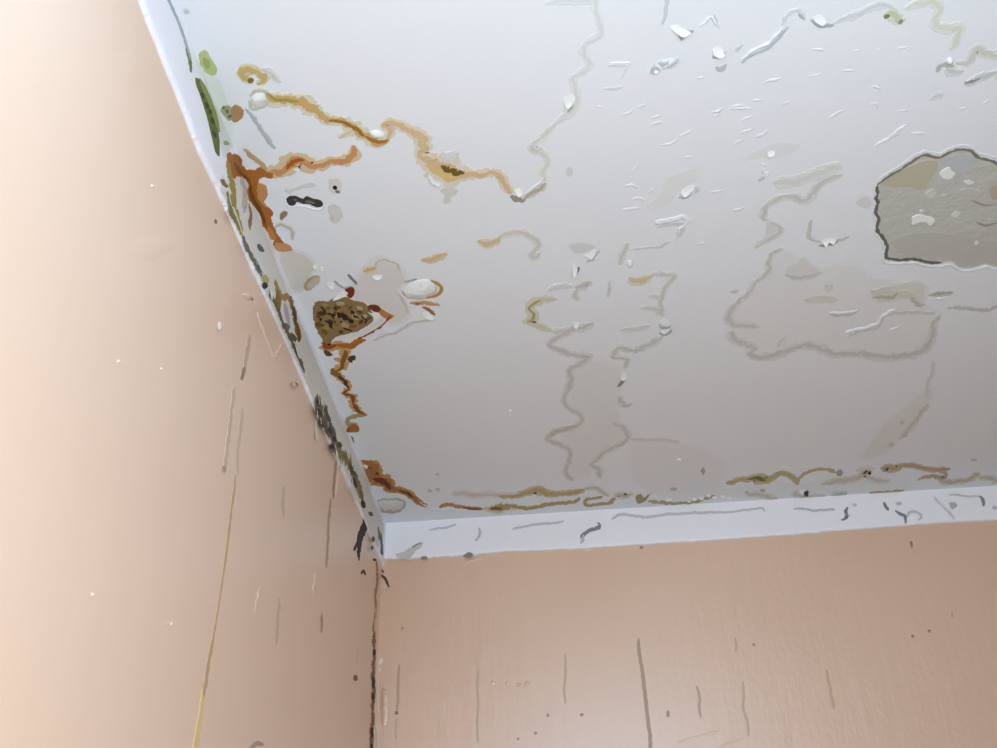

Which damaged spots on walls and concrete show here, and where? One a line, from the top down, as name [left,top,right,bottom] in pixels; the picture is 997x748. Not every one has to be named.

peeling [670,25,694,41]
peeling [810,15,834,28]
peeling [650,58,679,74]
peeling [712,46,727,72]
water stain [186,48,235,158]
water stain [328,177,343,223]
peeling [871,144,997,272]
water stain [421,252,448,264]
water stain [477,228,543,260]
flaking render [313,282,386,344]
water stain [522,161,953,508]
mould [353,519,367,575]